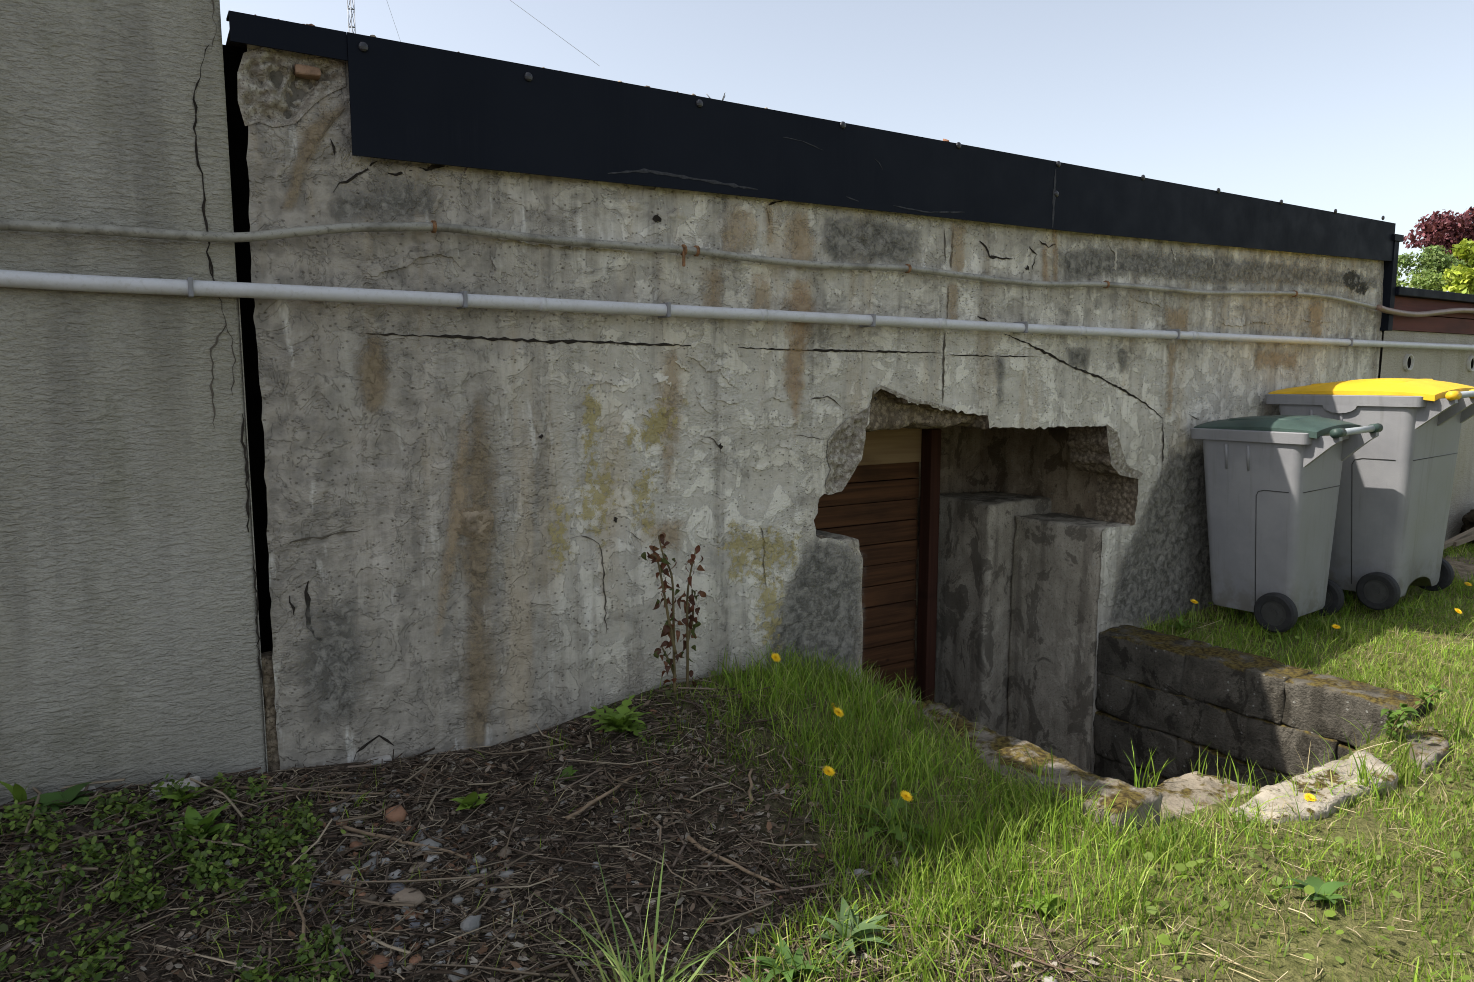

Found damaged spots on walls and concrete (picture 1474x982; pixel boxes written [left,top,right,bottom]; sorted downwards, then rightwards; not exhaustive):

spalling [237,47,346,127]
crack [193,0,324,697]
crack [738,226,1199,462]
spalling [826,385,952,494]
spalling [1106,424,1143,479]
crack [291,529,363,542]
leakage [442,406,496,744]